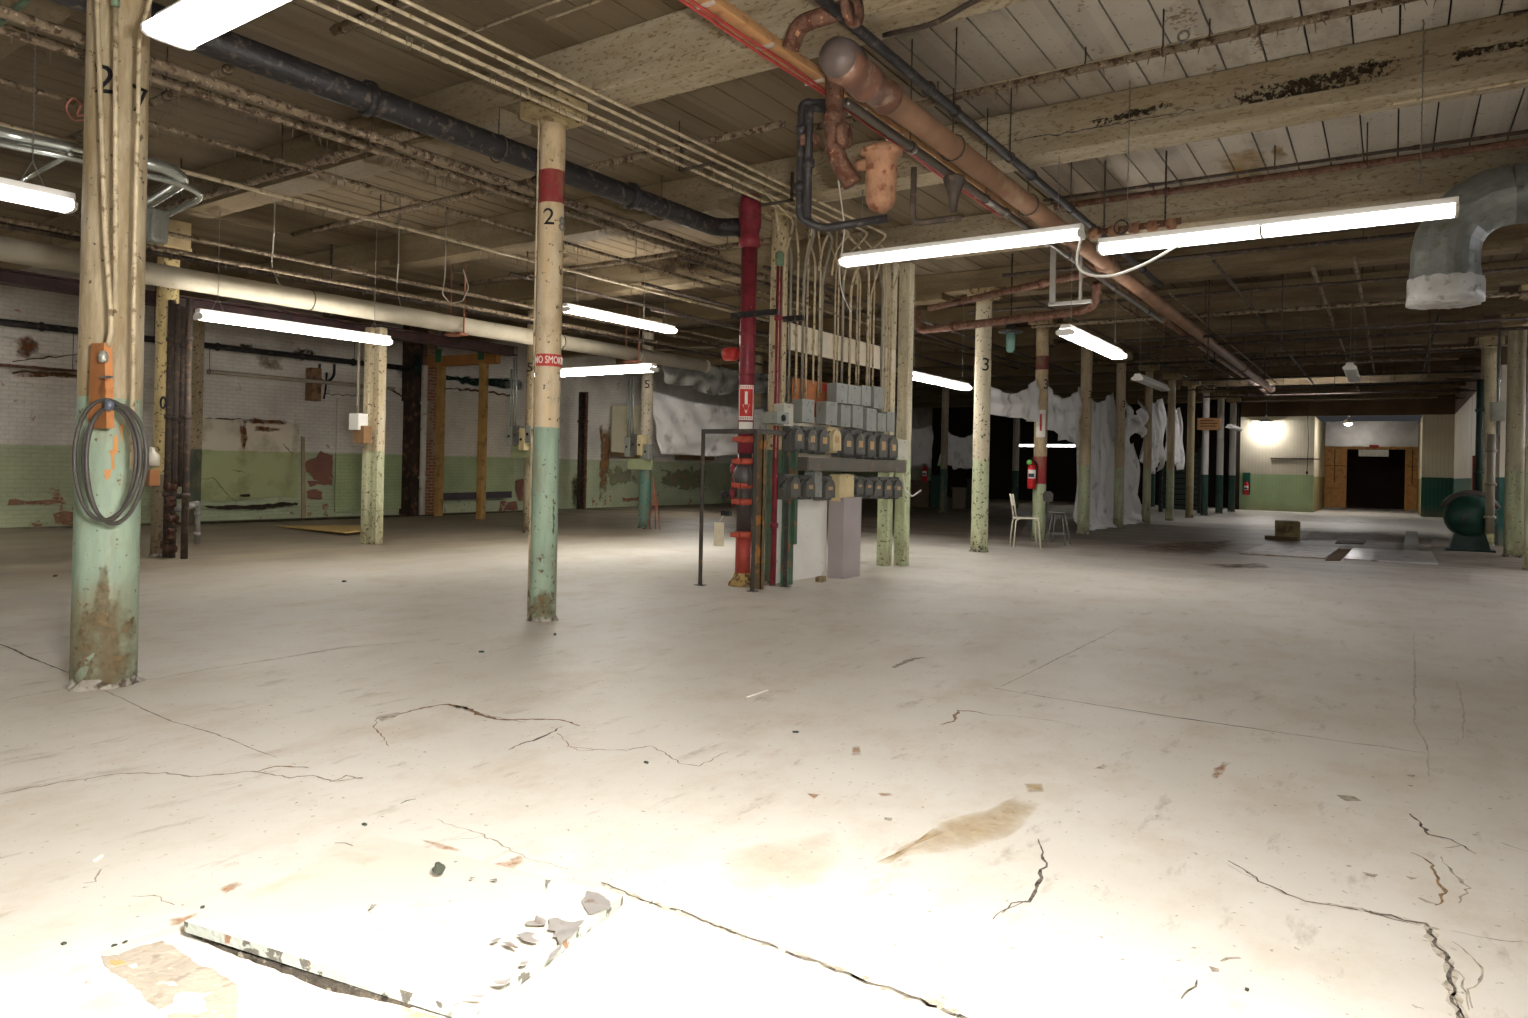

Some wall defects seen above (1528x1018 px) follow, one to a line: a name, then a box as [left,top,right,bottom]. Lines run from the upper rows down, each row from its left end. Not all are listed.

water stain [1228,56,1399,105]
water stain [1452,39,1528,61]
water stain [1092,103,1171,126]
flaking render [305,451,333,500]
spalling [8,499,73,526]
crack [0,642,407,794]
crack [373,704,727,766]
crack [400,799,975,1018]
crack [993,839,1048,919]
crack [1229,814,1525,1018]
peeling [101,927,415,1018]
crack [1181,957,1241,999]